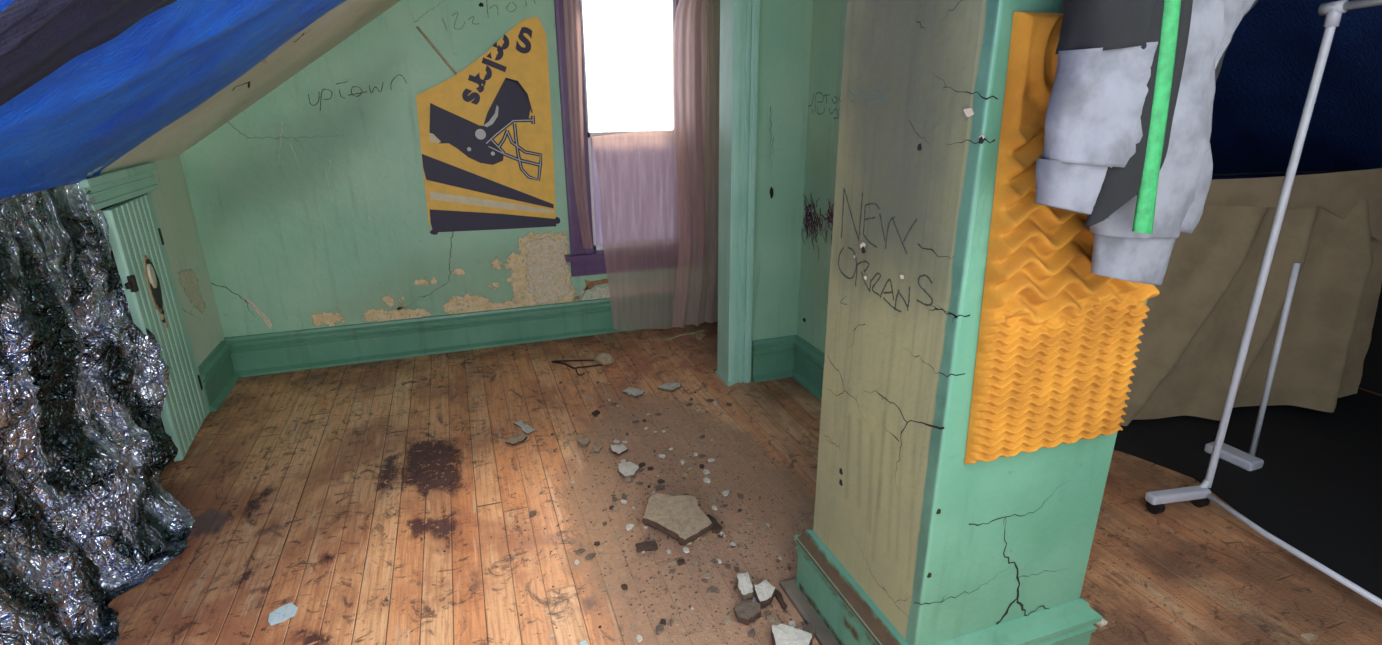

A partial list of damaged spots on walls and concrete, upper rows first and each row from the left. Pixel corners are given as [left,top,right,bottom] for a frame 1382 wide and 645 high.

peeling [310,231,675,327]
crack [827,324,944,484]
water stain [377,440,462,497]
water stain [407,515,457,539]
crack [854,486,1068,625]